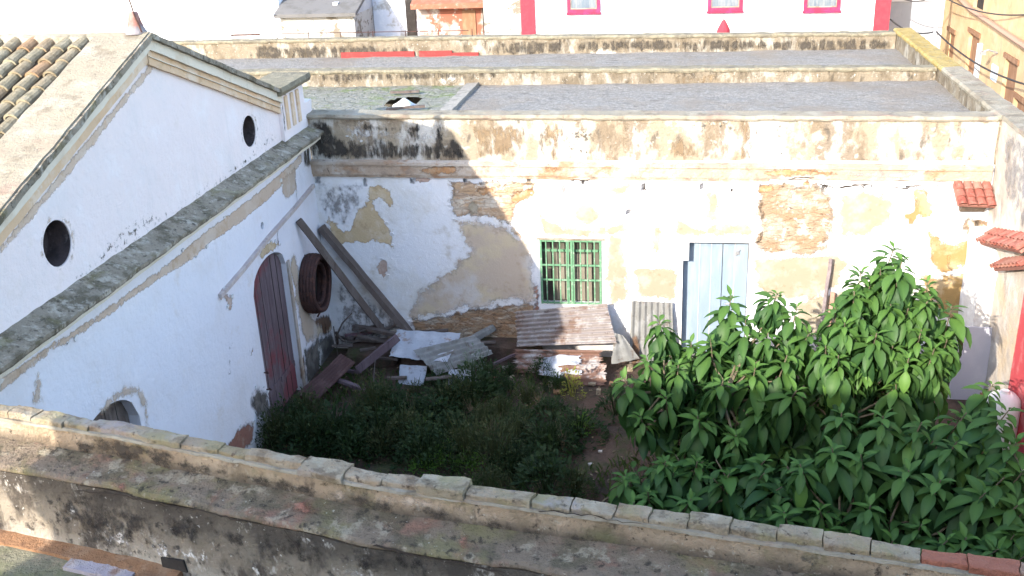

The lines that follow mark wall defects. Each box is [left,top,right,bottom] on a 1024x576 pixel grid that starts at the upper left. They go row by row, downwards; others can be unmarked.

water stain [257,46,407,59]
water stain [499,39,561,54]
water stain [578,39,889,54]
water stain [304,121,463,166]
peeling [324,185,394,247]
flaking render [377,258,391,278]
peeling [406,166,539,339]
flaking render [676,169,893,336]
flaking render [229,385,271,448]
mould [253,477,309,493]
water stain [56,497,150,545]